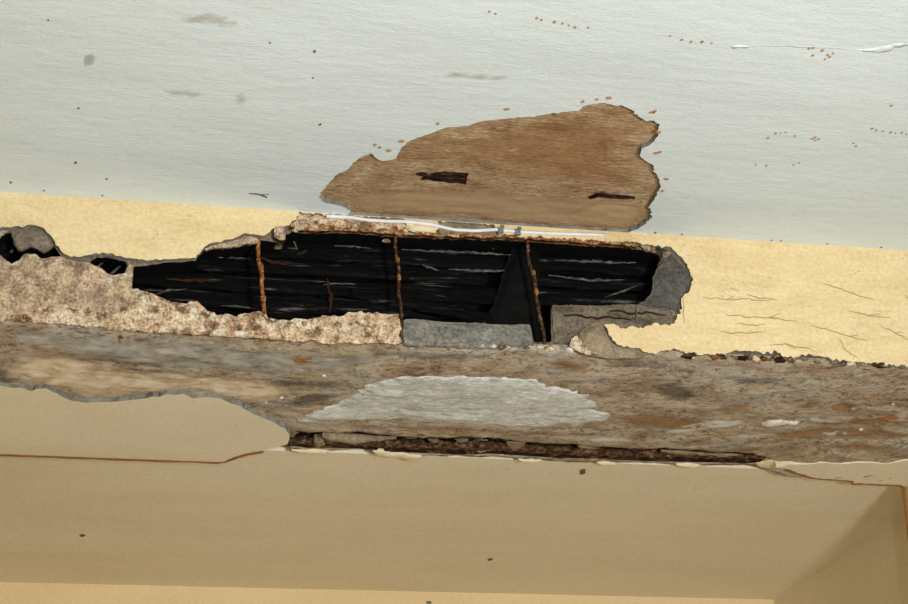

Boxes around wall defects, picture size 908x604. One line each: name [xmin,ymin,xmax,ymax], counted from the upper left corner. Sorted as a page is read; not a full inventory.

peeling [321,96,669,229]
rust [289,224,640,250]
spalling [0,228,908,478]
crack [683,284,908,357]